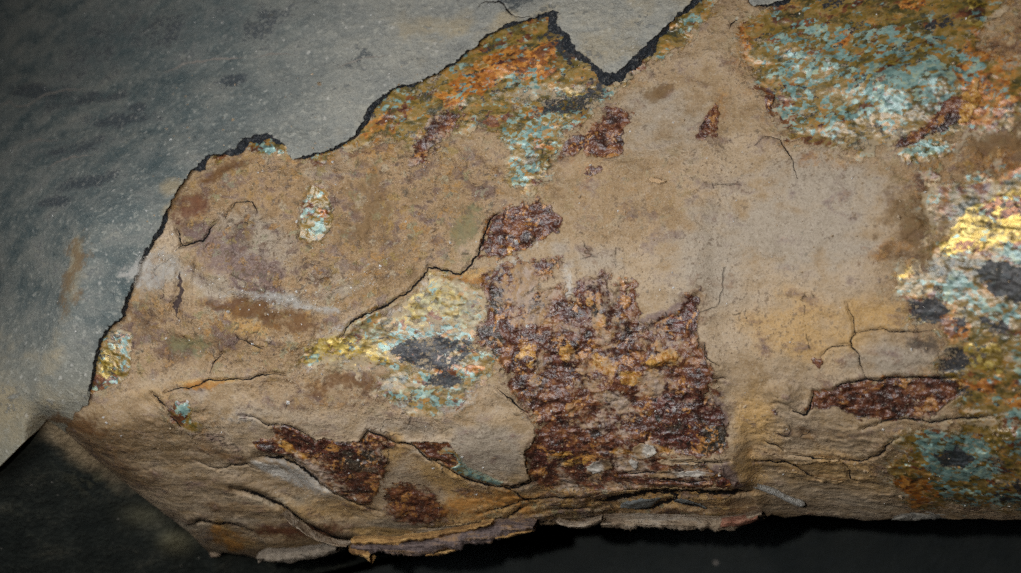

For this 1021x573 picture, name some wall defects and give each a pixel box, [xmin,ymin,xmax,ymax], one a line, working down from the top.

corrosion [558,103,634,176]
corrosion [695,103,720,141]
crack [342,213,499,336]
peeling [190,0,1021,518]
peeling [88,324,133,394]
peeling [167,400,203,433]
crack [153,339,286,427]
corrosion [252,195,764,564]
crack [361,430,752,523]
crack [755,416,989,481]
corrosion [804,372,966,423]
crack [820,304,956,387]